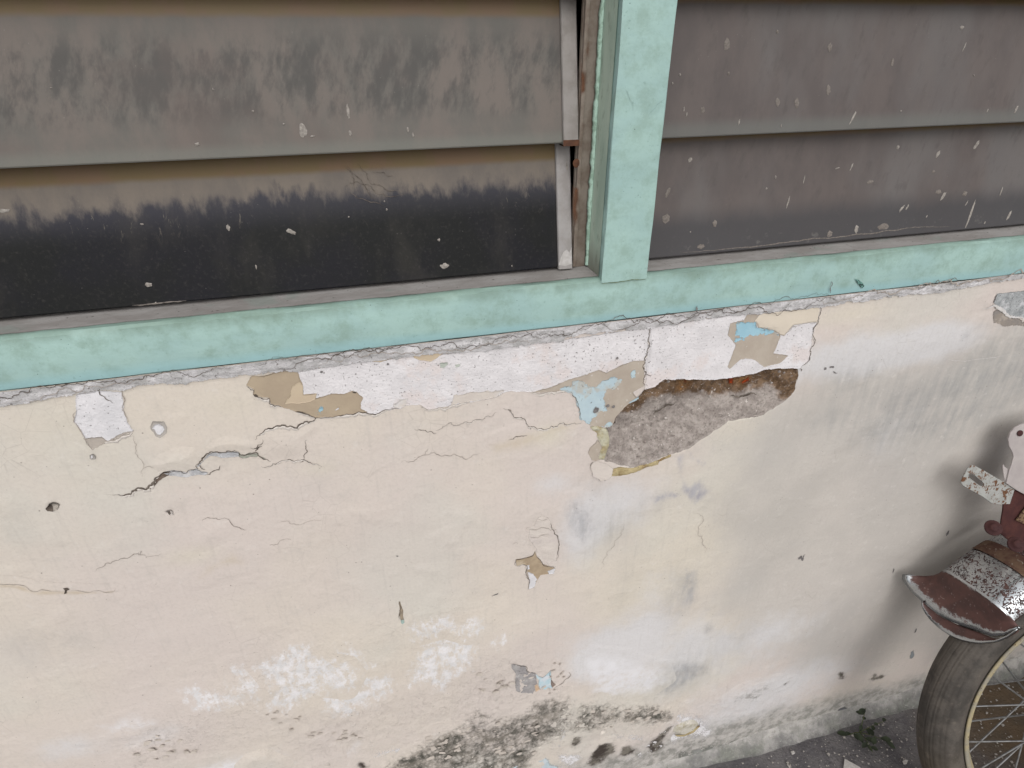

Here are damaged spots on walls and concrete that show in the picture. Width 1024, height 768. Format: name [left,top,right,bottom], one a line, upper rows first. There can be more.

peeling [984,291,1024,326]
peeling [73,390,133,460]
crack [117,417,320,499]
crack [406,408,581,462]
peeling [247,307,820,476]
peeling [515,552,555,589]
water stain [81,606,734,768]
peeling [477,663,571,694]